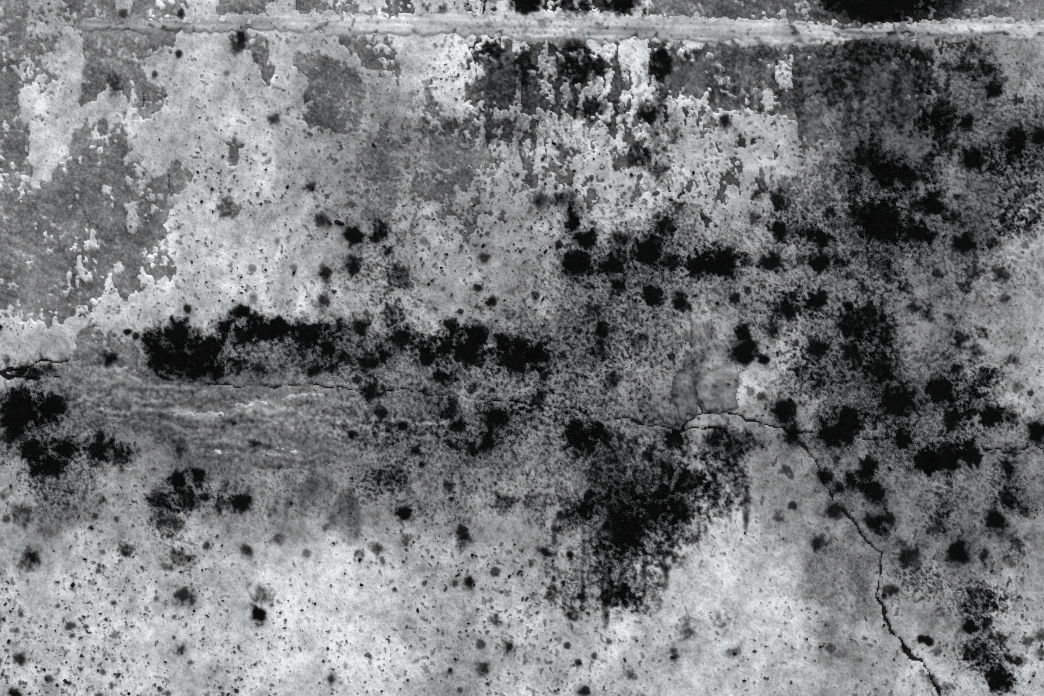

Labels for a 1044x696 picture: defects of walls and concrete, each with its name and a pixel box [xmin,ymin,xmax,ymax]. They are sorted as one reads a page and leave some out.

crack [0,357,70,380]
leakage [0,356,133,479]
peeling [0,0,195,371]
peeling [229,33,275,87]
leakage [123,219,565,455]
peeling [295,0,415,20]
crack [139,372,941,696]
leakage [538,411,756,622]
peeling [293,35,1002,247]
leakage [530,0,1044,567]
crack [853,435,1044,455]
leakage [958,580,1023,694]